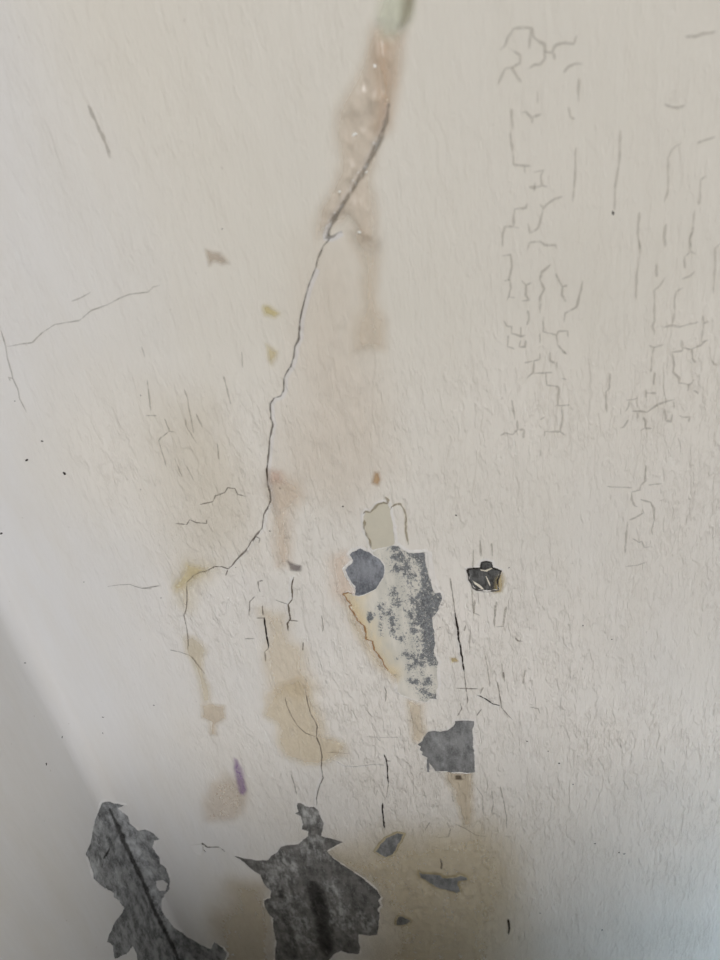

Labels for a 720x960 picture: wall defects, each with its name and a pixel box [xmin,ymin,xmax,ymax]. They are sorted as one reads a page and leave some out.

crack [323,102,390,242]
crack [187,268,320,584]
crack [261,576,294,648]
peeling [341,498,445,704]
crack [451,612,465,672]
peeling [464,558,504,593]
crack [302,690,324,806]
peeling [415,718,477,775]
peeling [84,799,230,960]
peeling [232,801,383,960]
peeling [373,831,406,859]
peeling [417,871,469,894]